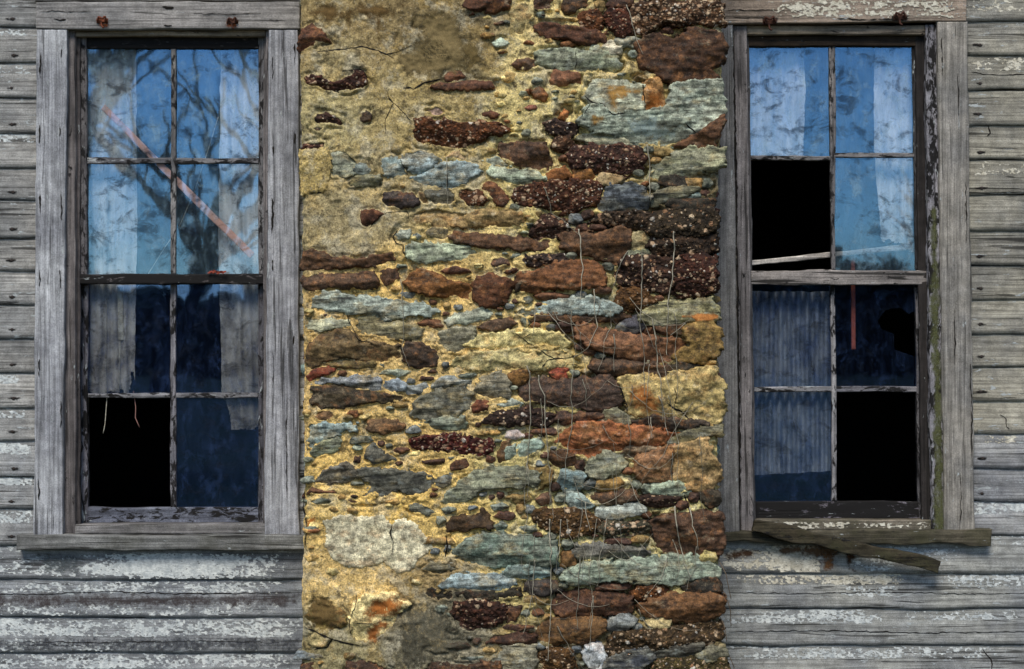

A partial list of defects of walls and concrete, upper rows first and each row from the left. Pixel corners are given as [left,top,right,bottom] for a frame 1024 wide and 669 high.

peeling [770,0,1023,18]
crack [272,44,440,134]
peeling [721,545,960,597]
peeling [941,574,1024,588]
peeling [0,546,300,669]
peeling [723,609,882,624]
peeling [907,610,1018,620]
peeling [730,646,998,659]